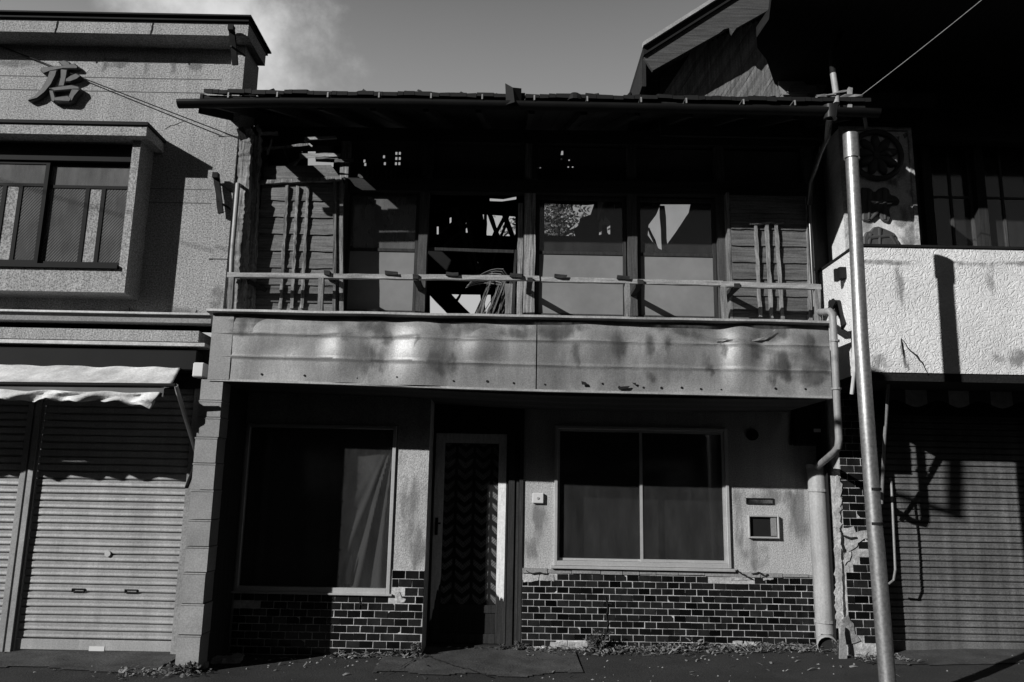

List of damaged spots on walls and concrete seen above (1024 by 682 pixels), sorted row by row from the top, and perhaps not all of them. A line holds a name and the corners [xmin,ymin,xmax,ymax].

crack [901,338,928,374]
spalling [833,475,867,645]